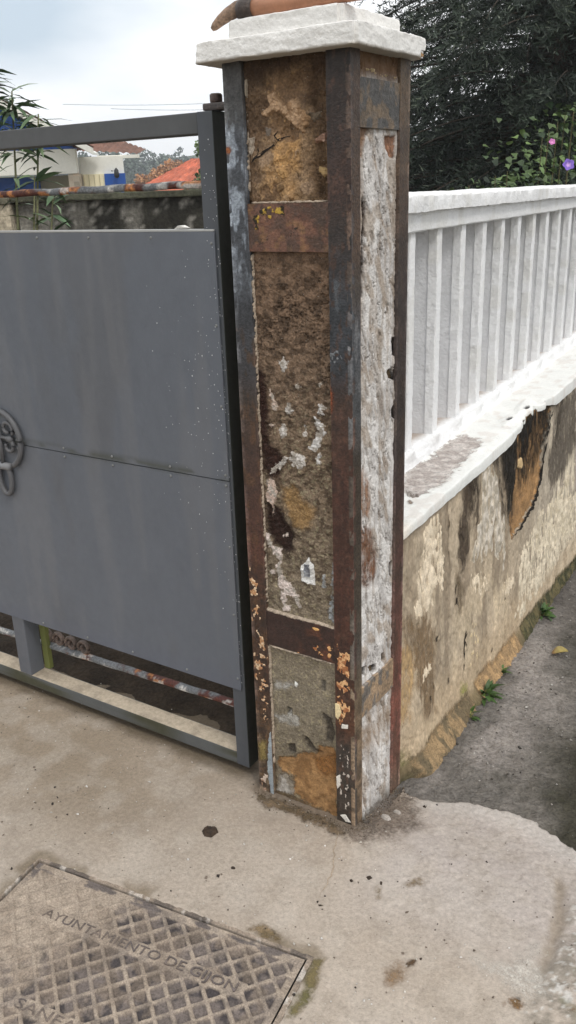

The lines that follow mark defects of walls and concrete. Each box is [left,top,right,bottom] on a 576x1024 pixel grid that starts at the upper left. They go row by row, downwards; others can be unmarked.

crack [252,131,289,162]
peeling [269,389,295,439]
peeling [265,404,327,515]
peeling [266,532,302,611]
corrosion [361,476,375,585]
water stain [457,475,479,612]
peeling [404,406,576,778]
corrosion [313,644,350,725]
spalling [261,703,351,823]